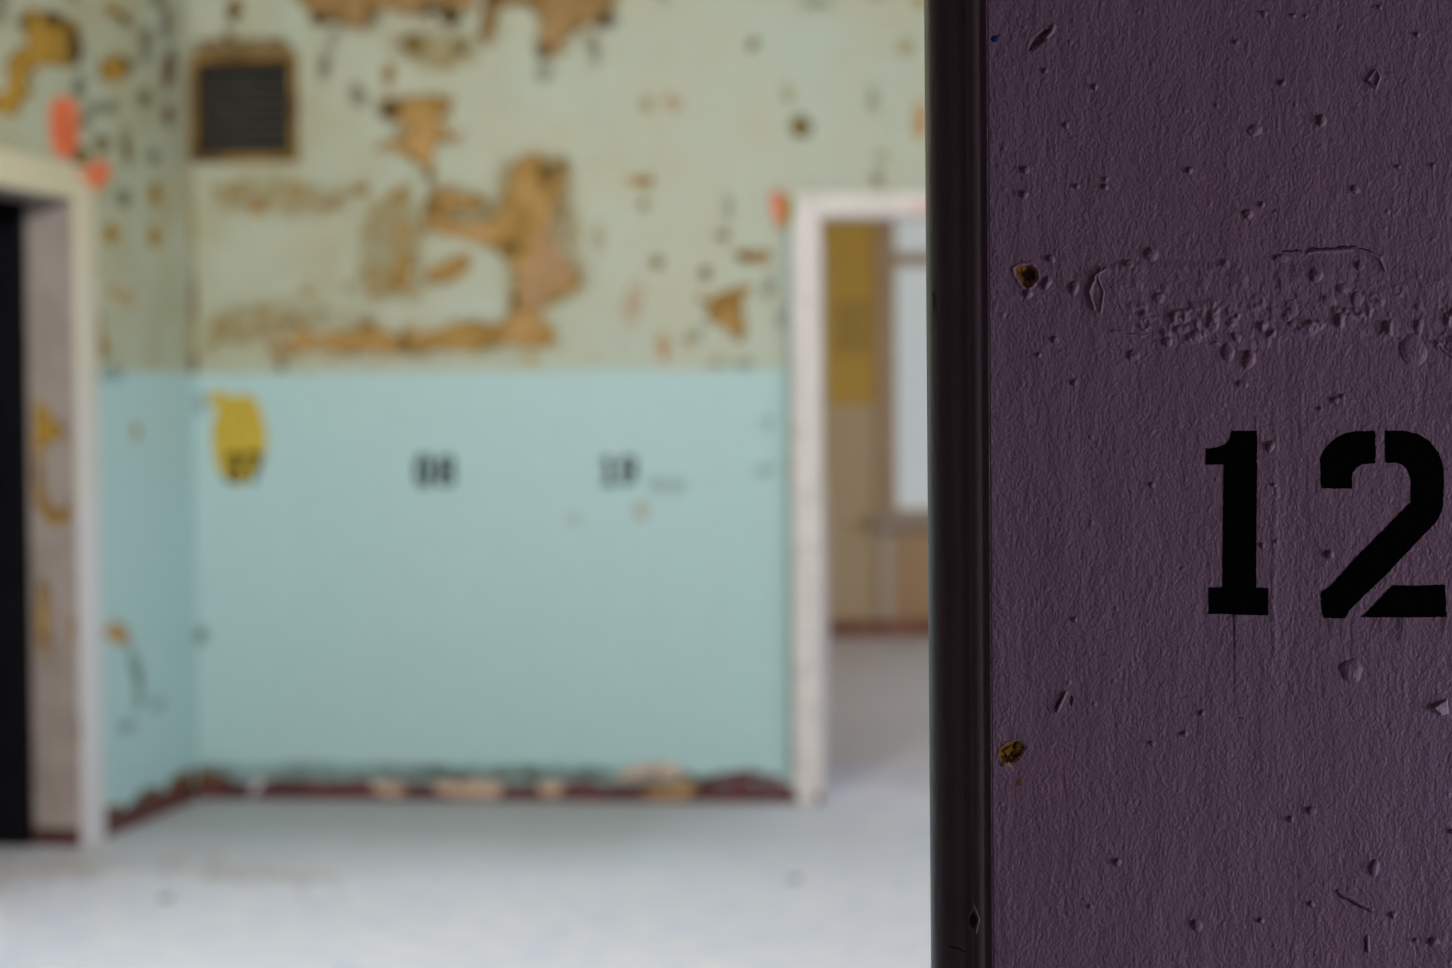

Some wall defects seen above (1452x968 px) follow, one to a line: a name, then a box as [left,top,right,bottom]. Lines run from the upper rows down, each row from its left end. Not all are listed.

peeling [0,1,134,118]
peeling [222,0,243,46]
peeling [267,0,617,372]